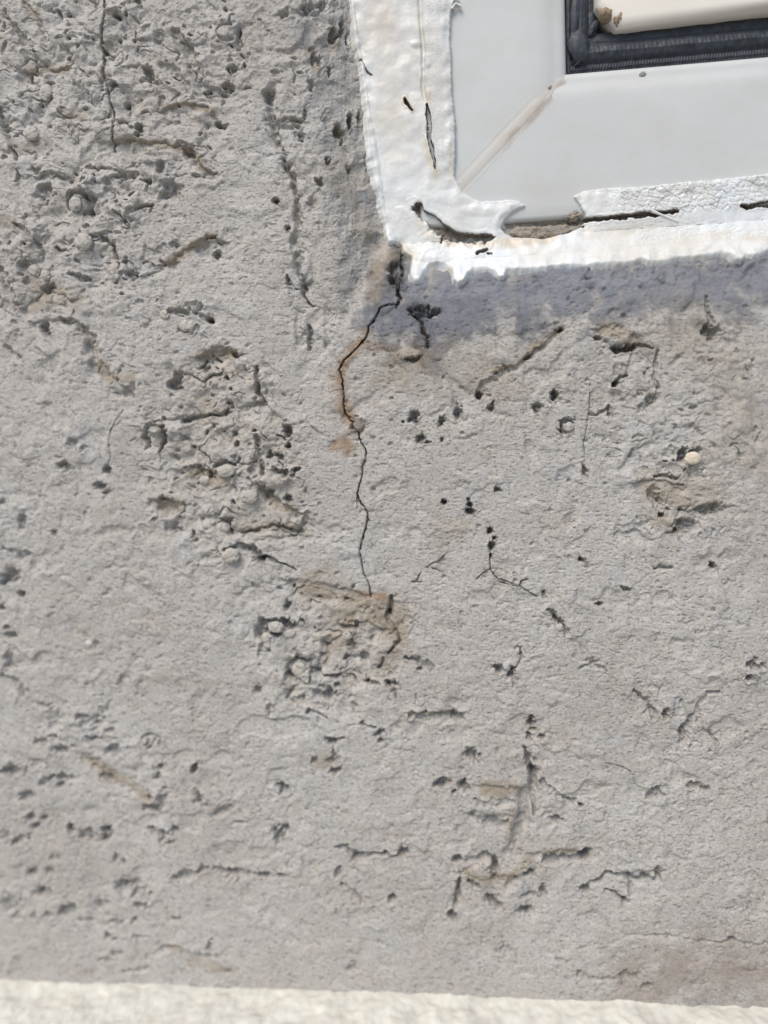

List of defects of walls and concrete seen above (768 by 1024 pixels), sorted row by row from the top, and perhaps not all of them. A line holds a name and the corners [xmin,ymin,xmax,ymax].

crack [425,103,436,169]
crack [582,209,679,228]
crack [740,201,768,210]
crack [339,253,431,595]
spalling [646,445,725,536]
spalling [141,346,435,720]
crack [478,554,533,595]